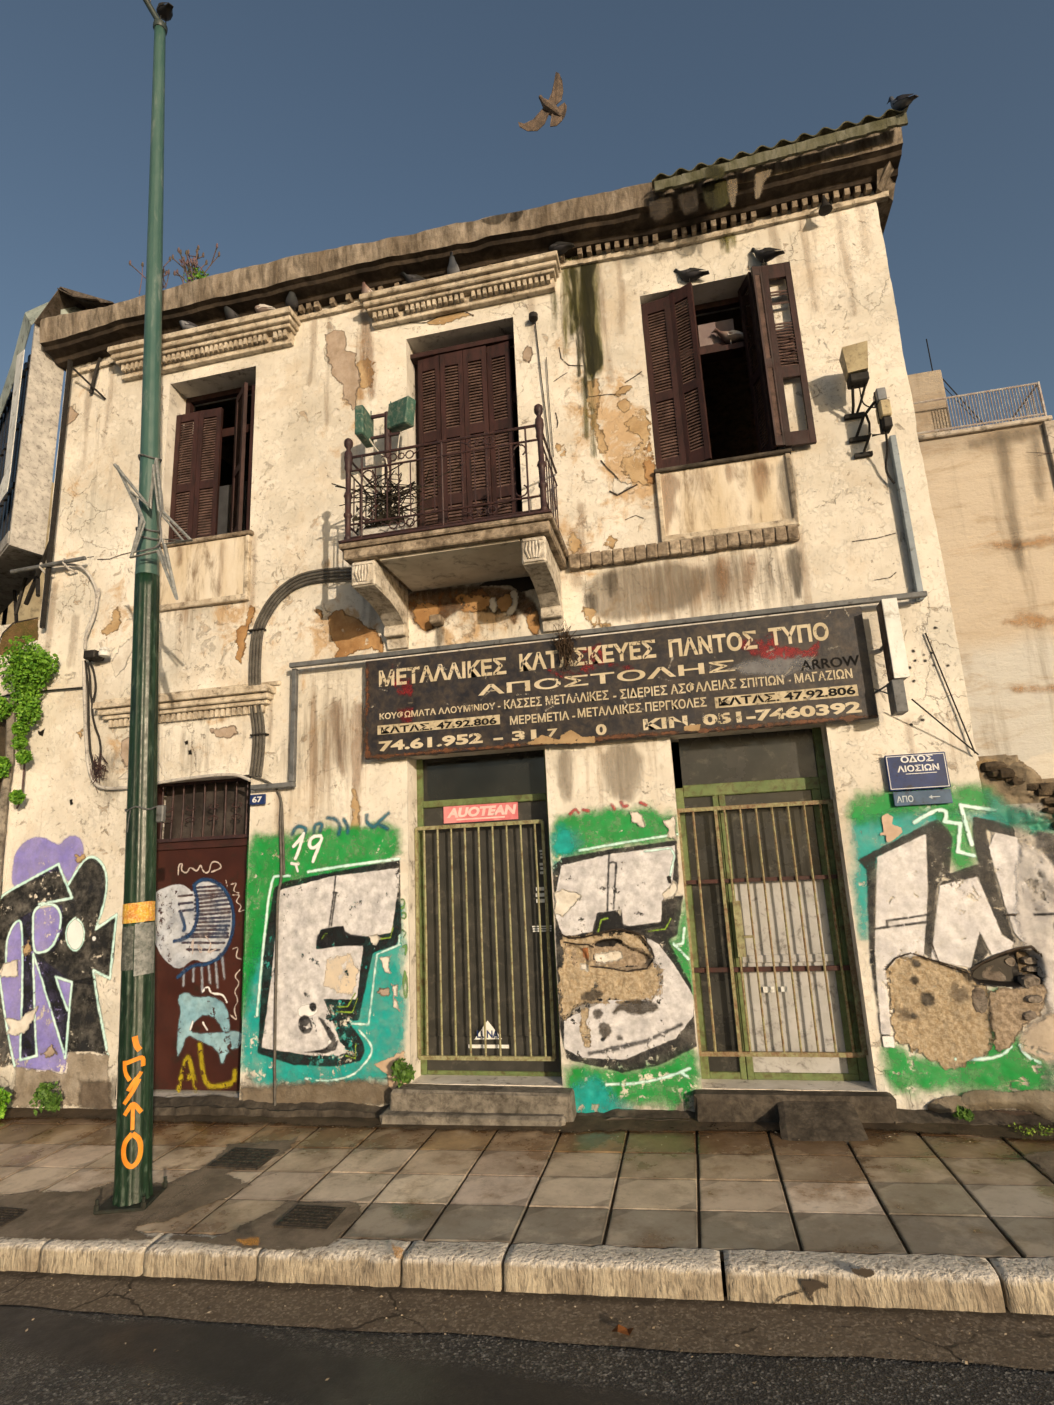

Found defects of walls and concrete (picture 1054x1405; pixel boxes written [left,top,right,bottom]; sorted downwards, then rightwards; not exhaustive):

leakage [564,251,603,379]
peeling [323,330,361,410]
peeling [585,385,656,496]
leakage [989,430,1038,481]
peeling [101,606,133,678]
peeling [234,605,255,664]
peeling [314,609,384,658]
peeling [630,811,646,828]
peeling [663,815,677,839]
peeling [662,876,678,901]
spalling [554,889,665,1048]
spalling [884,945,1048,1070]